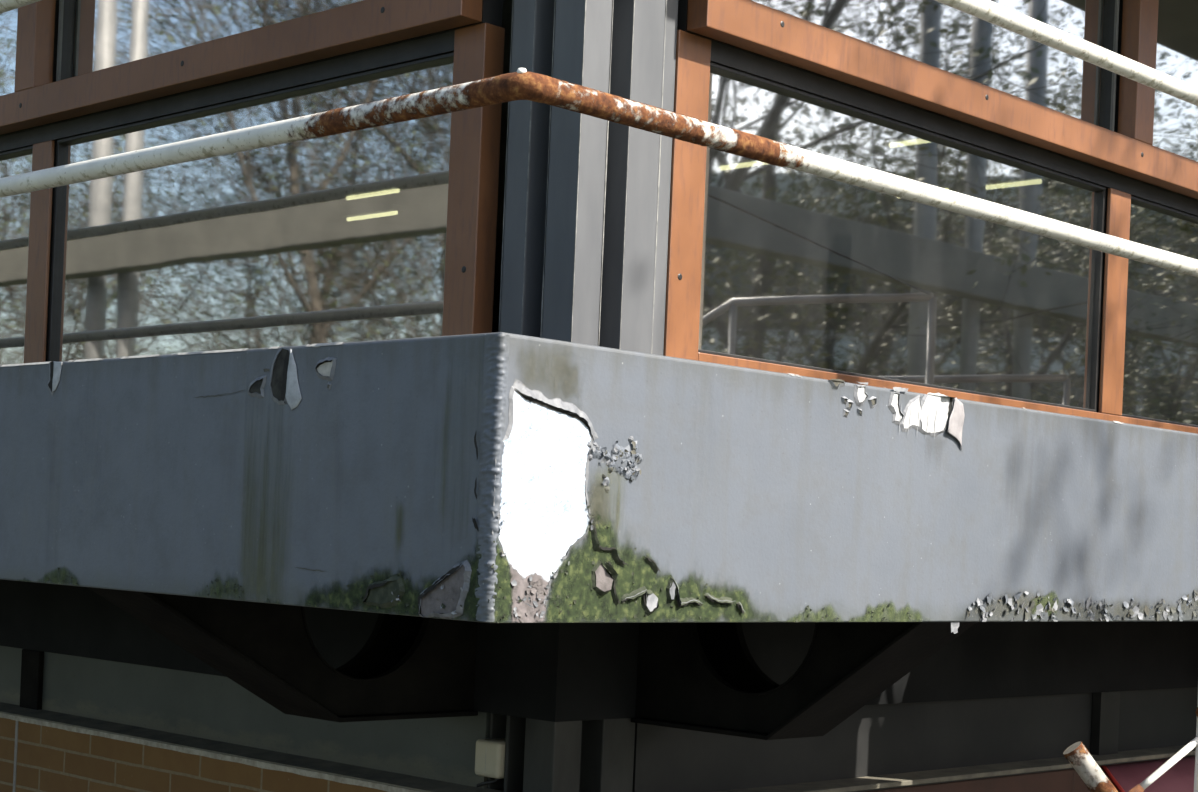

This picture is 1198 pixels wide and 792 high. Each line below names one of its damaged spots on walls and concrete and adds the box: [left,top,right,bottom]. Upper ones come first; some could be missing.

rust [289,72,809,172]
peeling [0,358,102,396]
peeling [120,348,248,359]
peeling [248,342,346,411]
peeling [828,379,965,451]
peeling [492,379,598,623]
peeling [417,559,472,620]
peeling [951,590,1198,634]
rust [1063,741,1088,766]
rust [1087,770,1118,792]